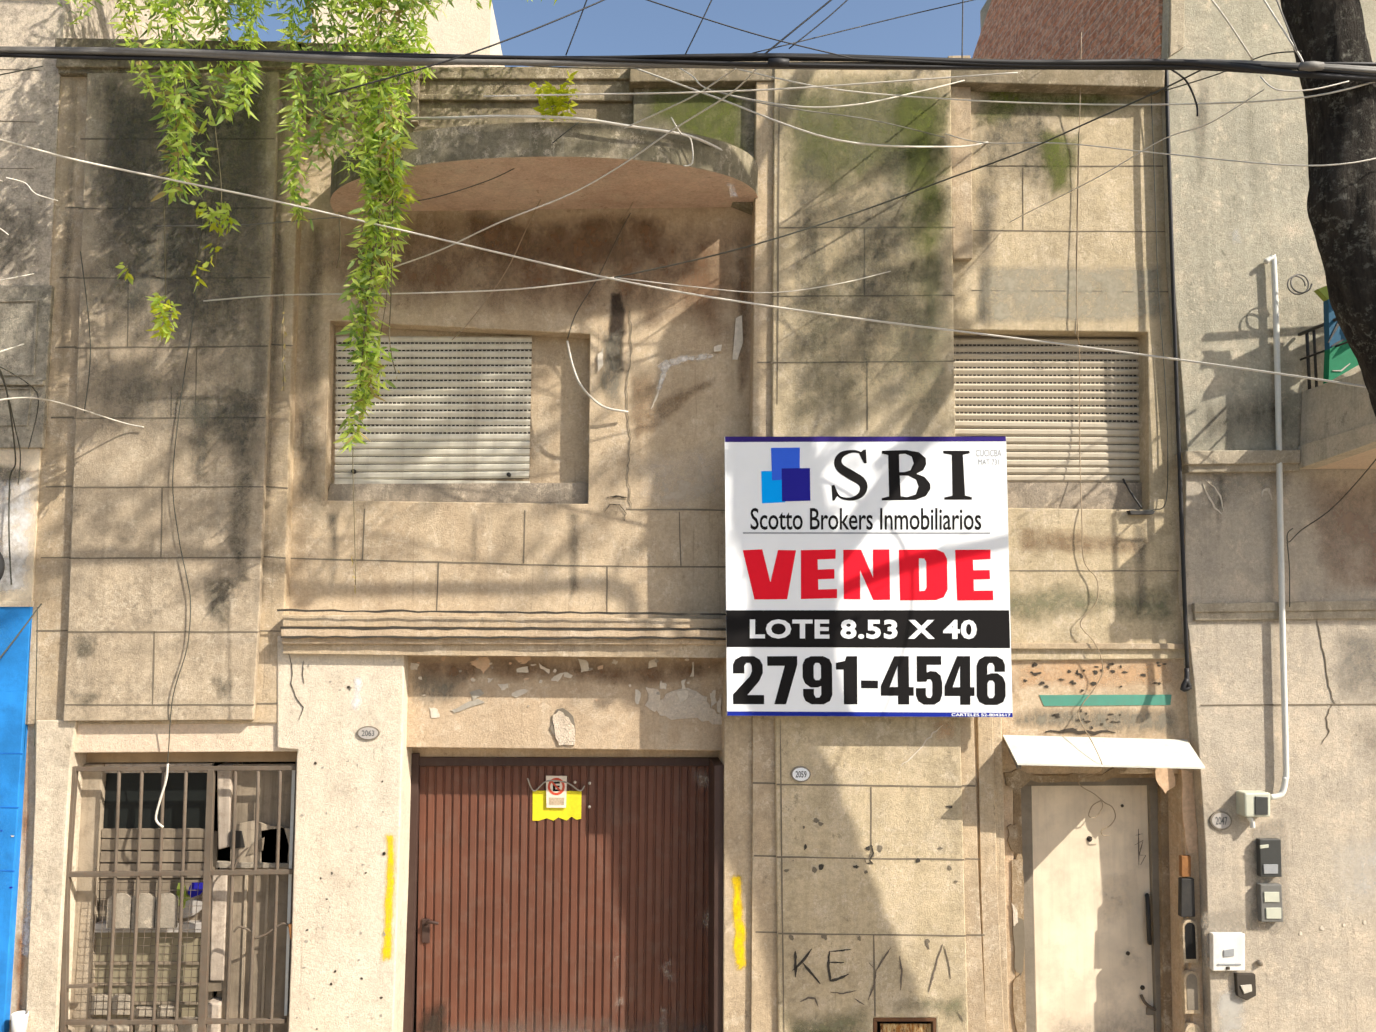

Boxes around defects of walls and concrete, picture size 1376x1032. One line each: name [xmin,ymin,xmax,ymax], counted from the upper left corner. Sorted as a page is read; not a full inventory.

damp [986,92,1113,189]
damp [107,84,259,332]
damp [801,93,942,397]
damp [343,220,747,436]
spalling [550,708,576,746]
peeling [410,656,722,725]
peeling [1024,662,1167,692]
crack [1317,622,1335,743]